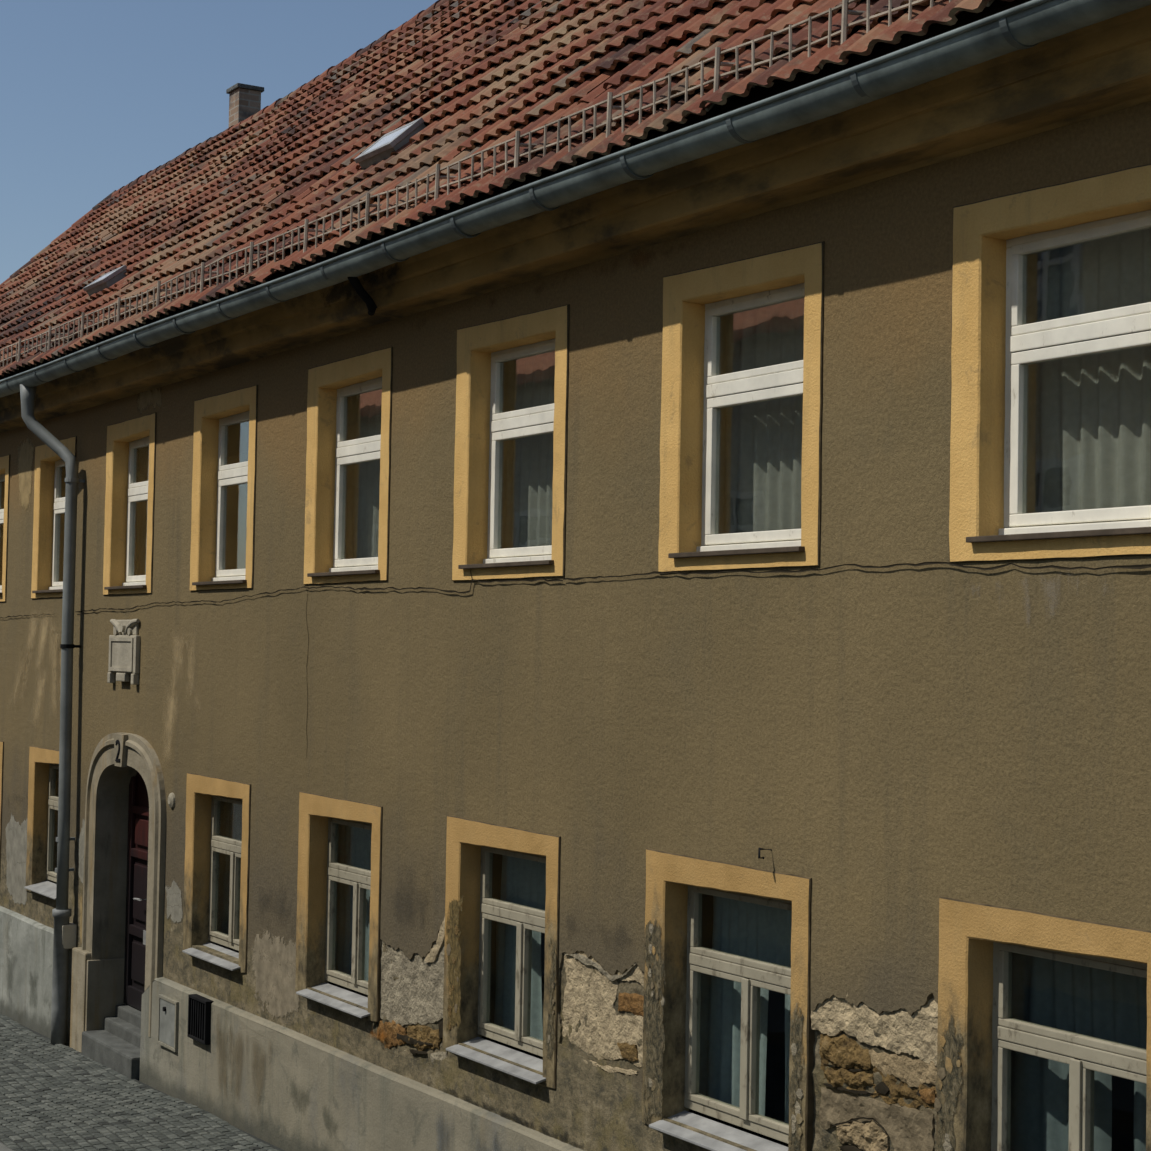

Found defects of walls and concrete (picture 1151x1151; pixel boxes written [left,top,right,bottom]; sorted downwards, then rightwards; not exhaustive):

crack [0,562,1151,733]
spalling [375,895,464,1064]
water stain [446,1090,581,1147]
spalling [560,919,666,1126]
spalling [788,993,963,1151]